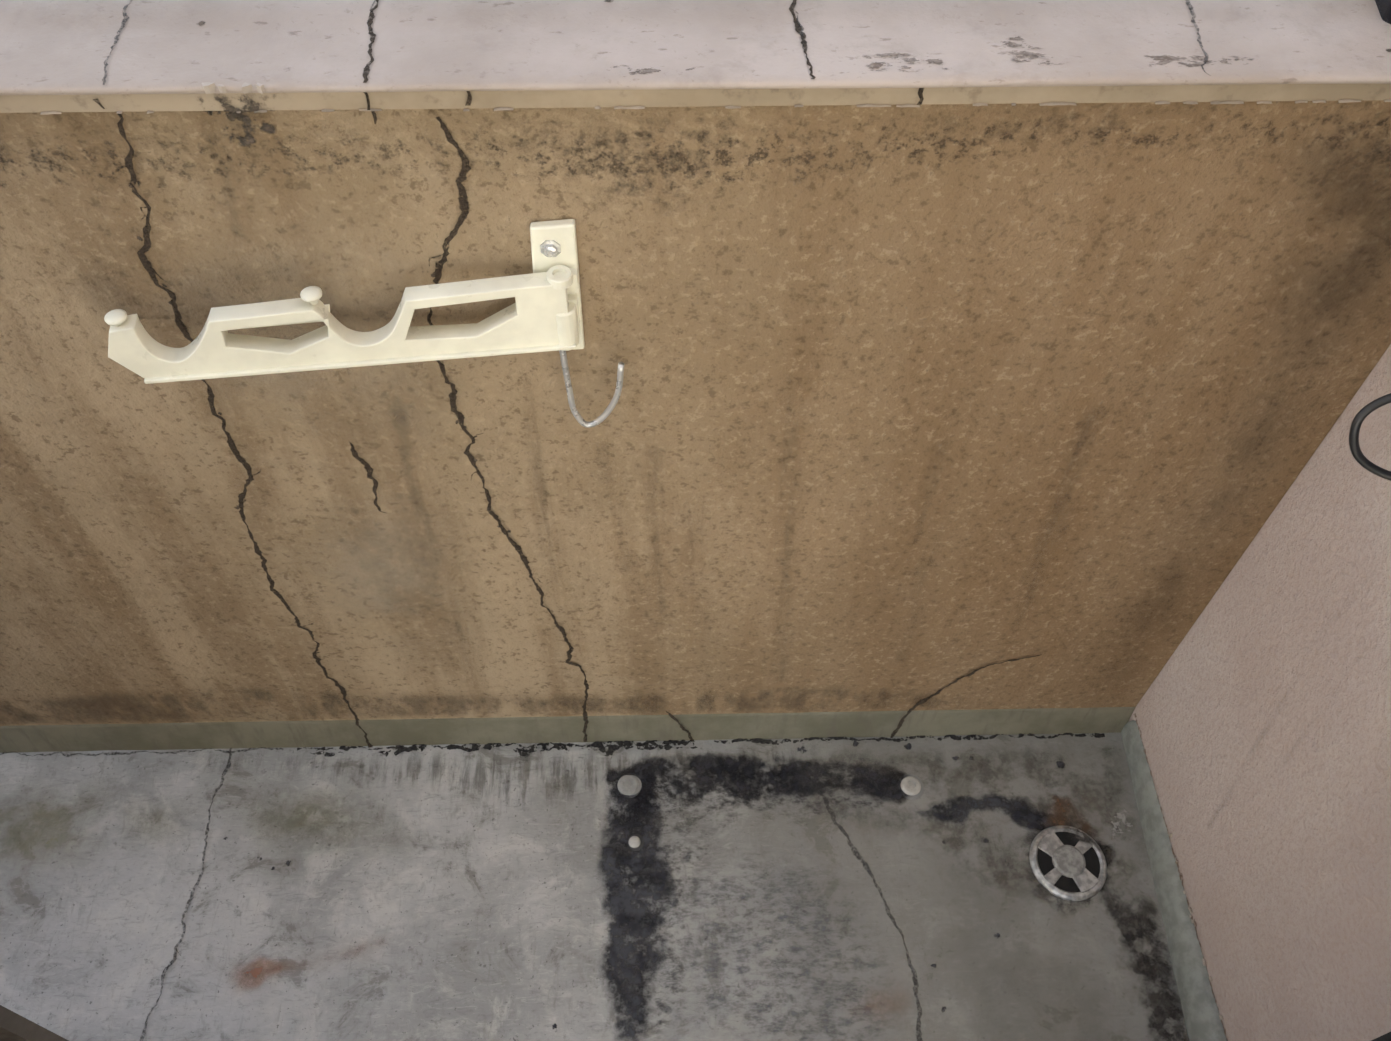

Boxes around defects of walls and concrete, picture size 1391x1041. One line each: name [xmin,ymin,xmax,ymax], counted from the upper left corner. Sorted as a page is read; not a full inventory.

crack [363,0,379,124]
crack [789,0,816,79]
crack [916,88,924,105]
crack [1186,2,1209,75]
crack [93,5,194,342]
crack [427,91,472,326]
leakage [567,137,738,188]
crack [1,360,1105,1041]
leakage [920,756,1133,850]
leakage [588,754,907,1041]